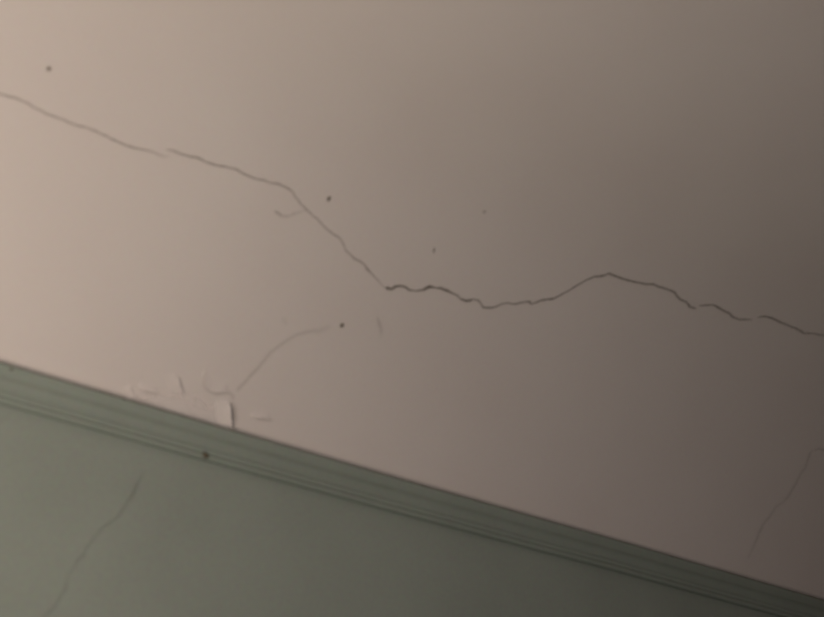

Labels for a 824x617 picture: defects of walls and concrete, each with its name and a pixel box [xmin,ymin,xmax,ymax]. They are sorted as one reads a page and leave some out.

crack [387,285,471,302]